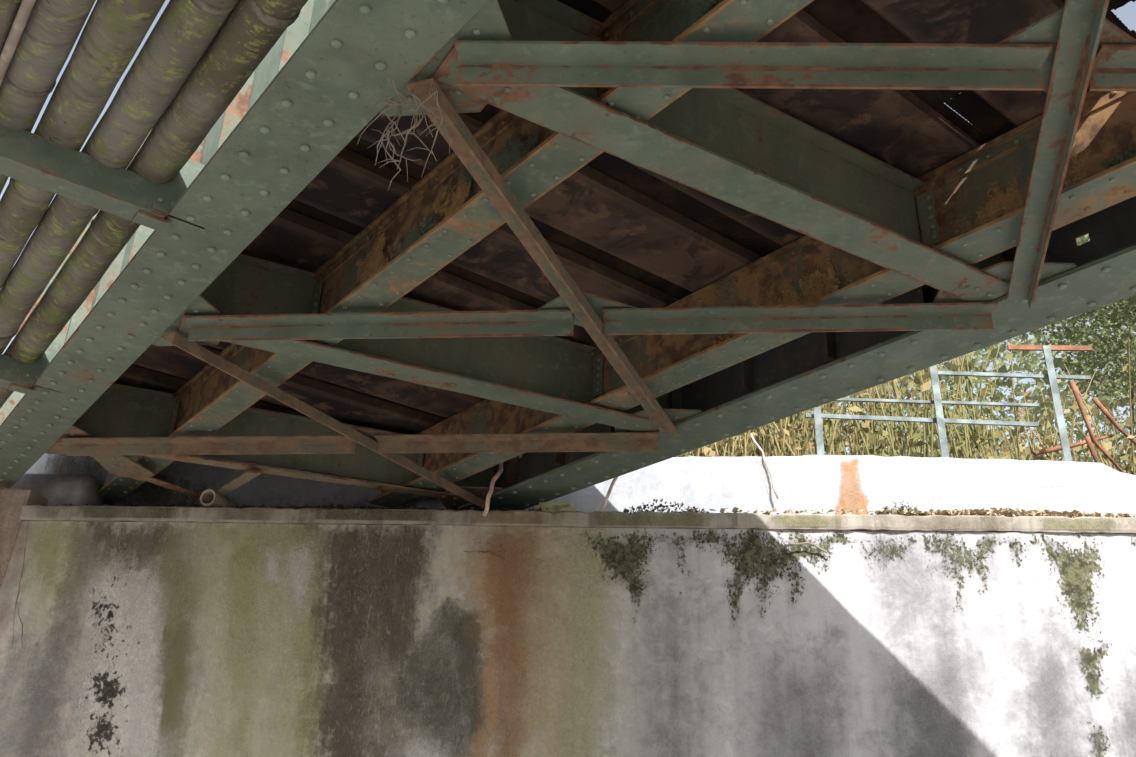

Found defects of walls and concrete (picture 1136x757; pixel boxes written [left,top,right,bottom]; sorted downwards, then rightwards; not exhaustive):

rust [929,174,1031,248]
rust [356,232,389,282]
rust [768,256,840,306]
rust [837,459,868,515]
leakage [597,512,703,526]
leakage [779,515,830,527]
leakage [52,474,206,757]
leakage [311,499,495,757]